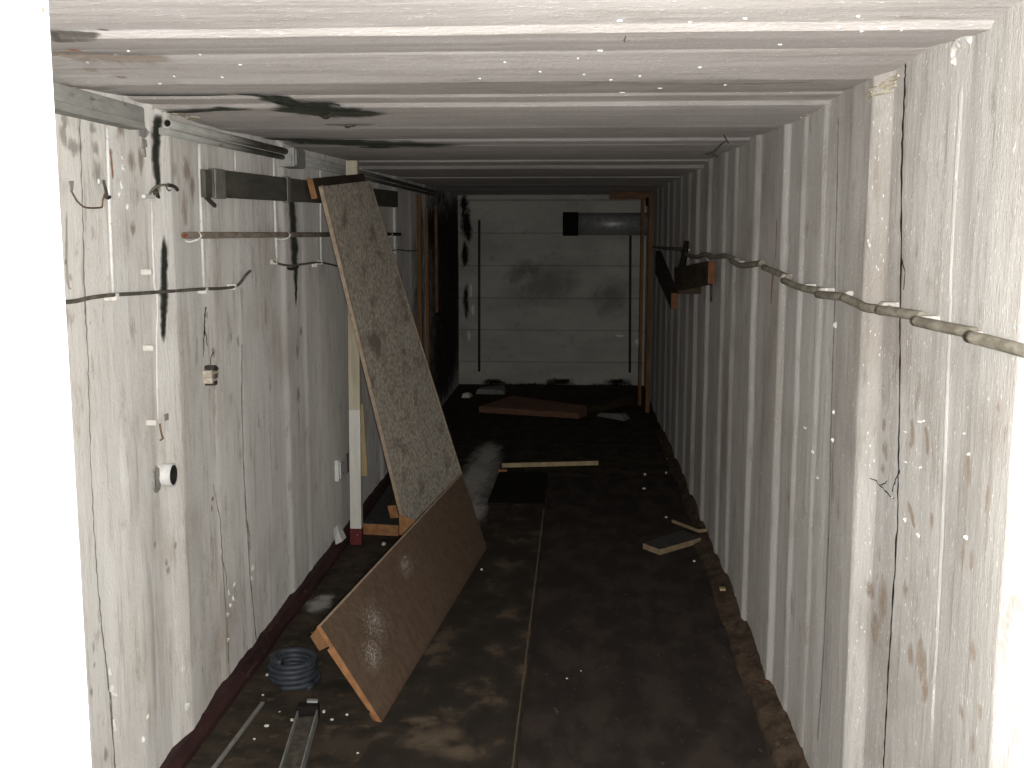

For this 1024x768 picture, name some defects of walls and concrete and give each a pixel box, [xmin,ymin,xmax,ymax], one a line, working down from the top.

water stain [123,94,381,190]
water stain [160,240,168,339]
water stain [287,202,299,303]
water stain [416,188,471,404]
crack [79,119,116,768]
crack [869,63,906,768]